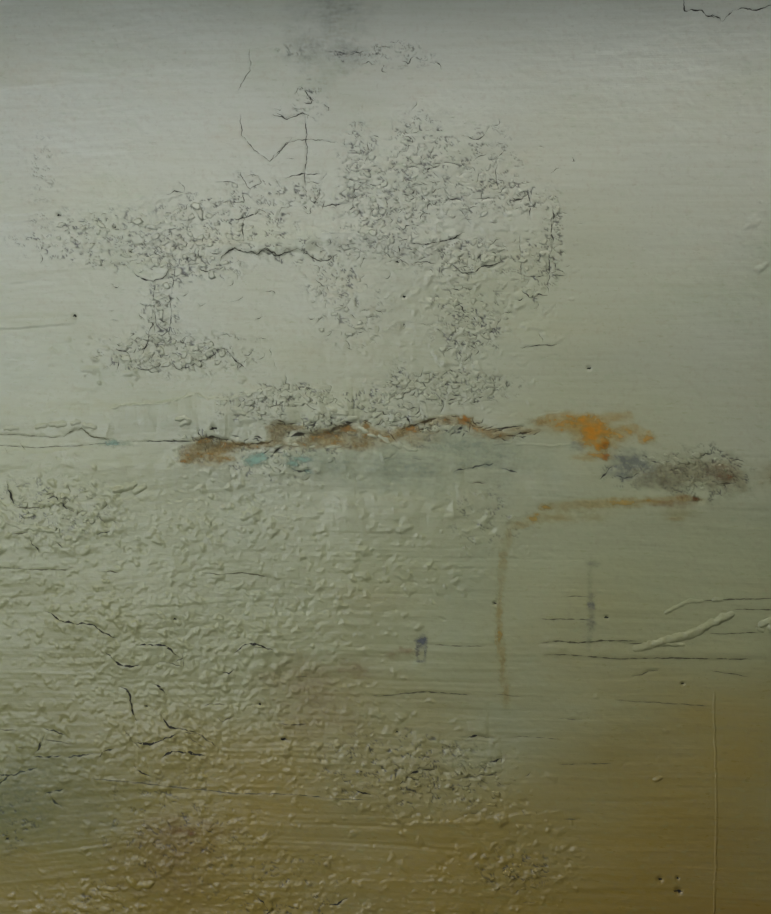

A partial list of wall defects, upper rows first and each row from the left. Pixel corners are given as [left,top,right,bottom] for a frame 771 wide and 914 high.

crack [683,0,770,20]
crack [200,87,343,272]
peeling [320,121,540,277]
peeling [80,201,263,373]
crack [118,267,245,370]
peeling [174,367,540,480]
rust [302,423,417,447]
rust [549,415,632,460]